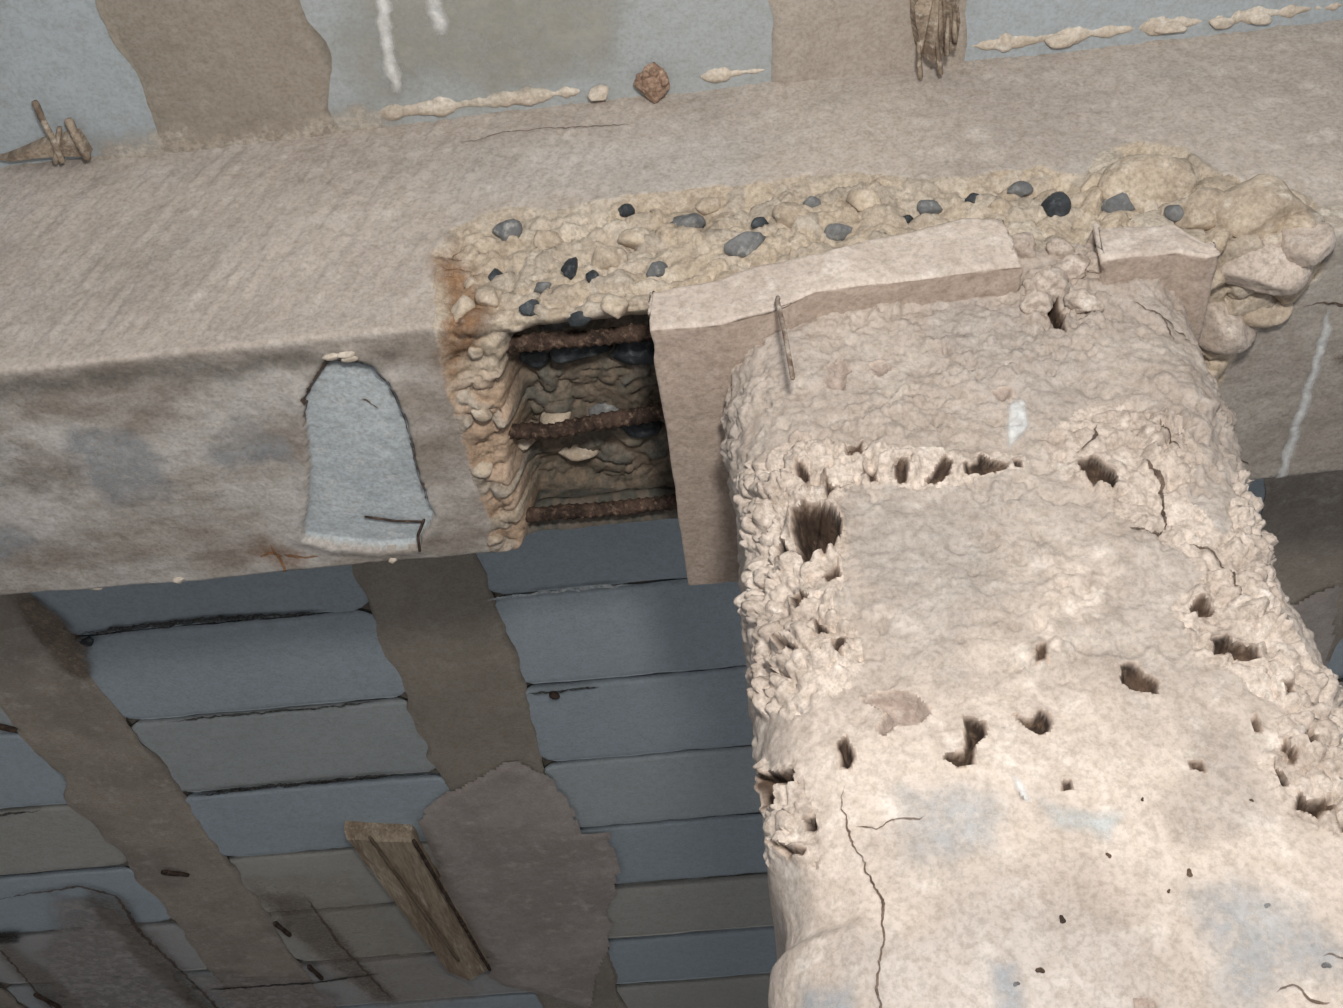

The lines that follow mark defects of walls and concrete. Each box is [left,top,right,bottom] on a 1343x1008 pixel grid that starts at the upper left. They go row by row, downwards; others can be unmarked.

water stain [374,0,605,89]
corrosion [506,323,652,354]
spalling [431,140,1336,552]
crack [1308,300,1343,308]
peeling [300,351,435,564]
corrosion [508,403,665,440]
efflorescence [1274,313,1331,478]
corrosion [525,494,677,523]
crack [840,791,922,1008]
crack [1280,984,1329,1004]